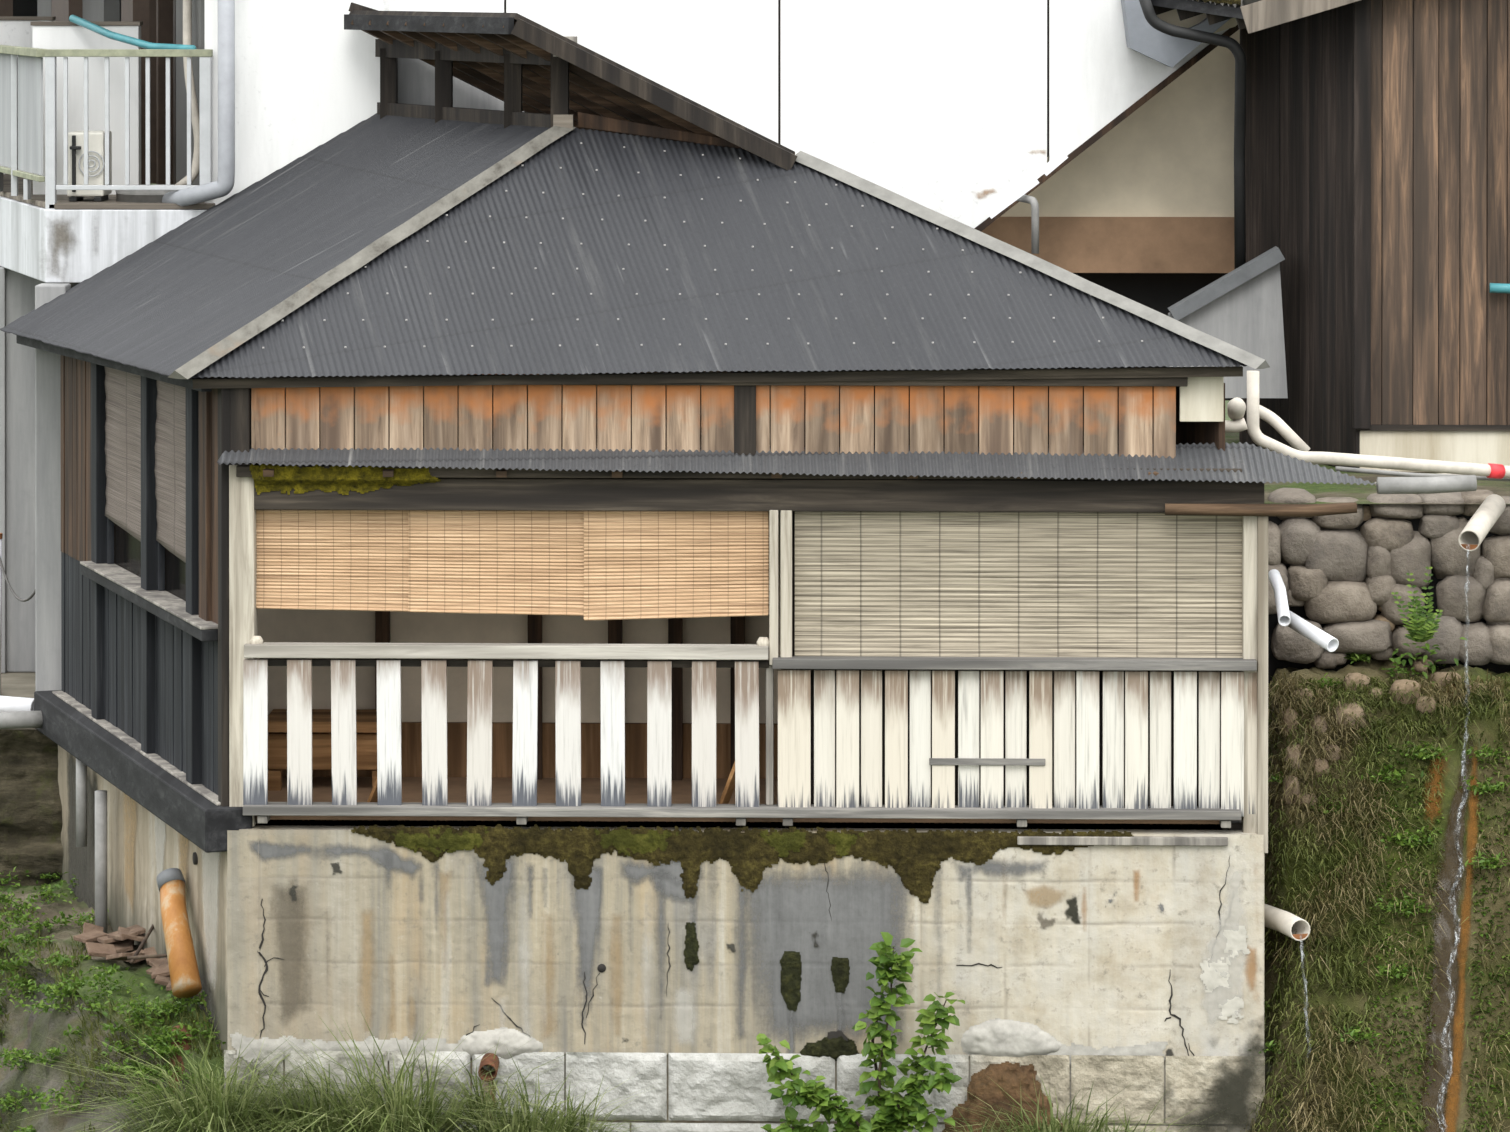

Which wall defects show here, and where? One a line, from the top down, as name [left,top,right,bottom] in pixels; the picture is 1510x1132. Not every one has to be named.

crack [258,899,284,1037]
leakage [279,890,304,1016]
leakage [251,841,437,877]
leakage [477,860,532,984]
leakage [573,868,602,996]
crack [581,972,600,1044]
leakage [623,861,697,964]
leakage [738,871,907,1036]
crack [1165,976,1194,1056]
crack [1209,857,1234,963]